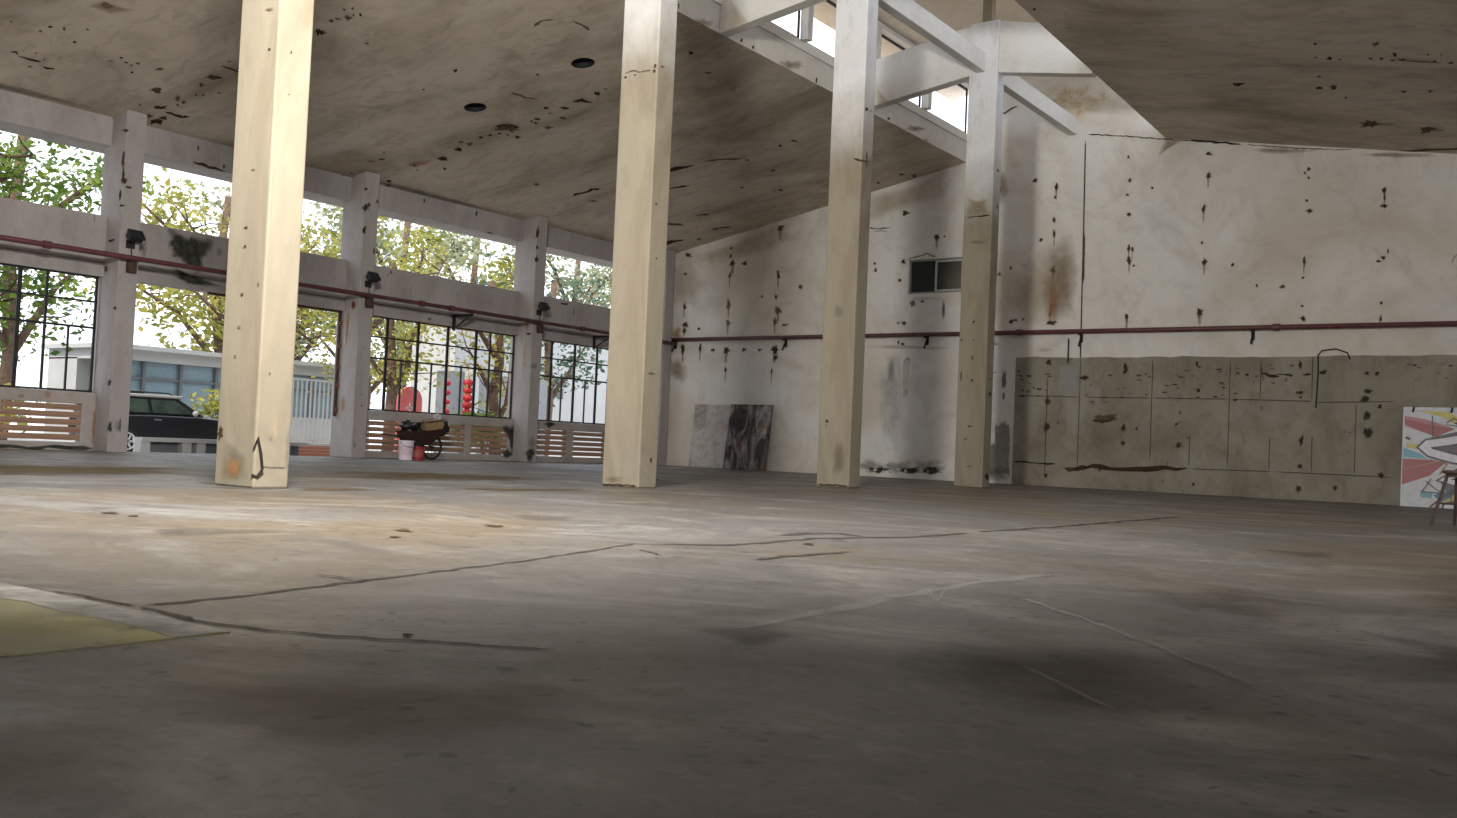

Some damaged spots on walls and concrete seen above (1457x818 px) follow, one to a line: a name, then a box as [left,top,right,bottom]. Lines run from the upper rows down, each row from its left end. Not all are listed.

damp [864,464,938,475]
crack [781,532,860,545]
crack [54,591,543,649]